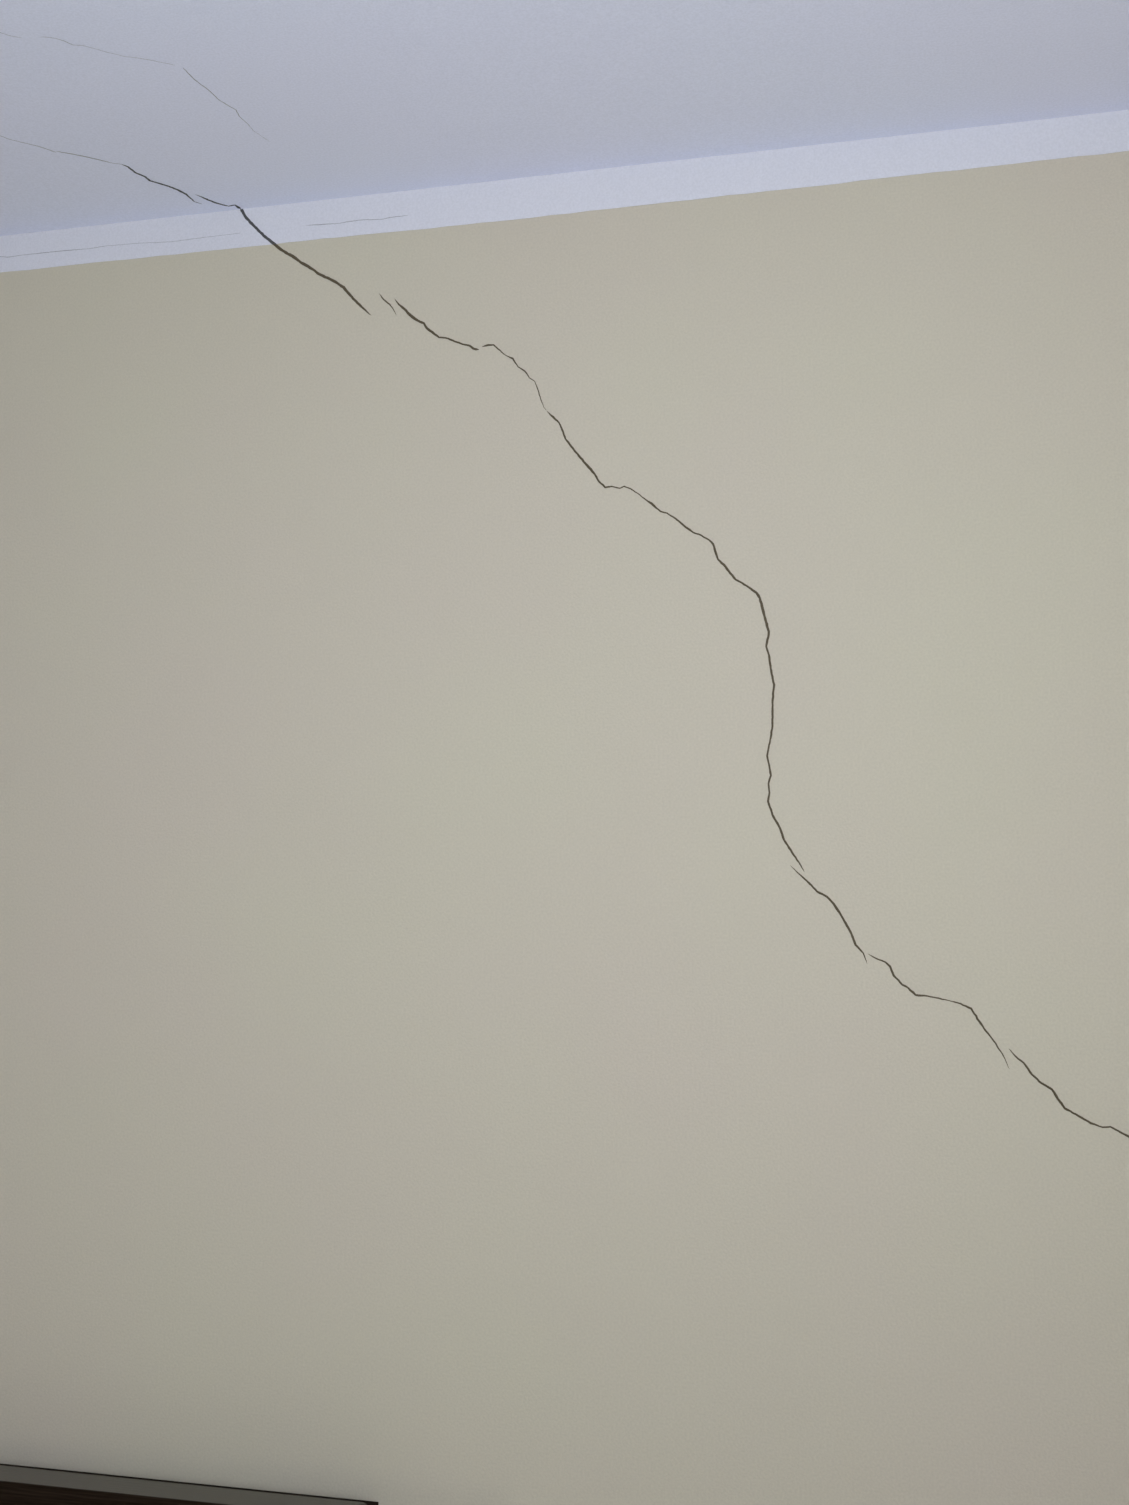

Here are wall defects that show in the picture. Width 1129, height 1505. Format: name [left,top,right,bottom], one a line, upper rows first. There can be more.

crack [0,136,1129,1138]